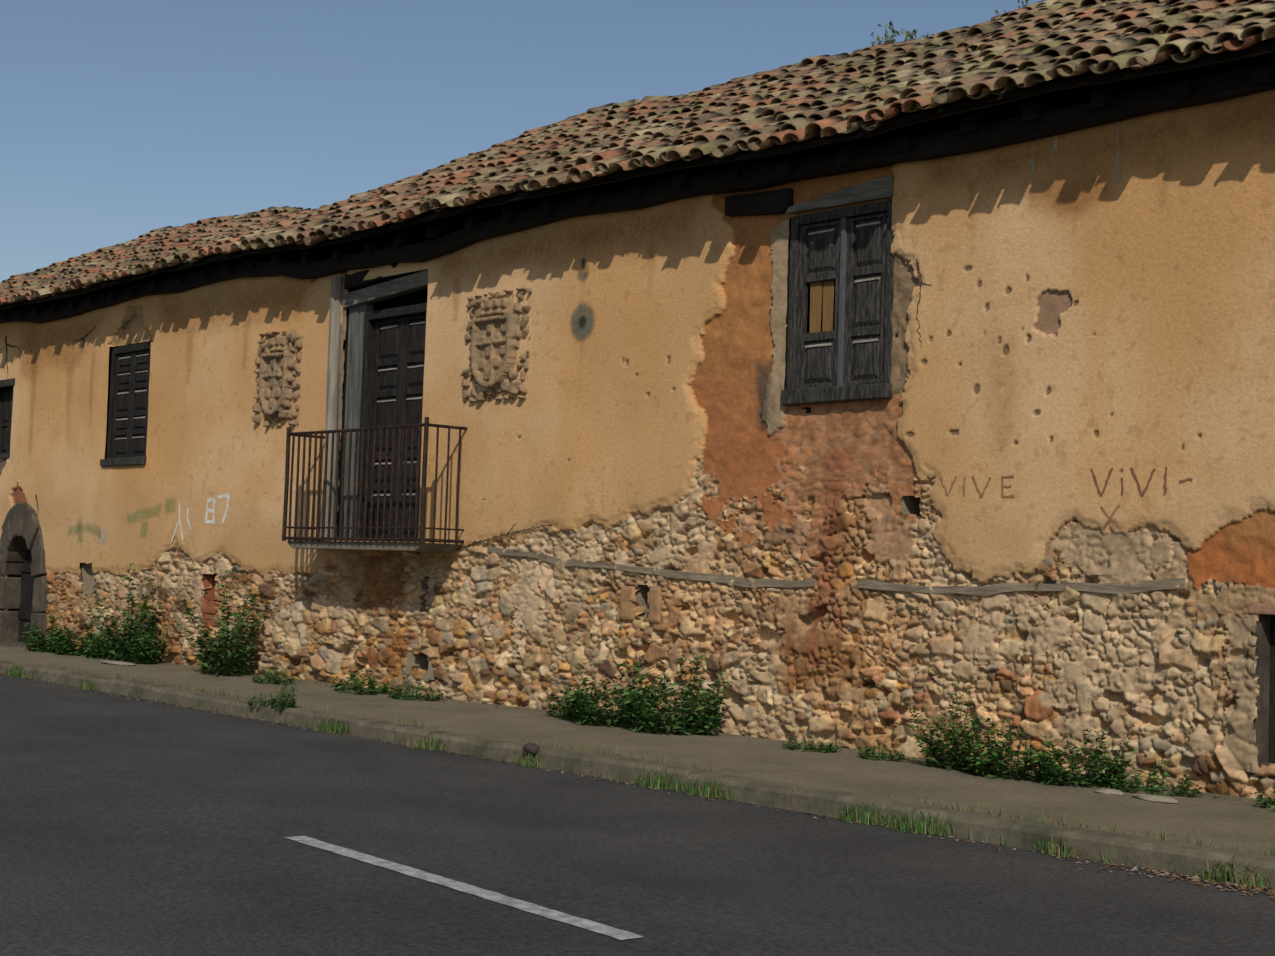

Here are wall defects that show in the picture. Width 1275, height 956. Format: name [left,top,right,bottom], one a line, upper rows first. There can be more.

flaking render [13,487,27,503]
flaking render [37,166,1275,799]